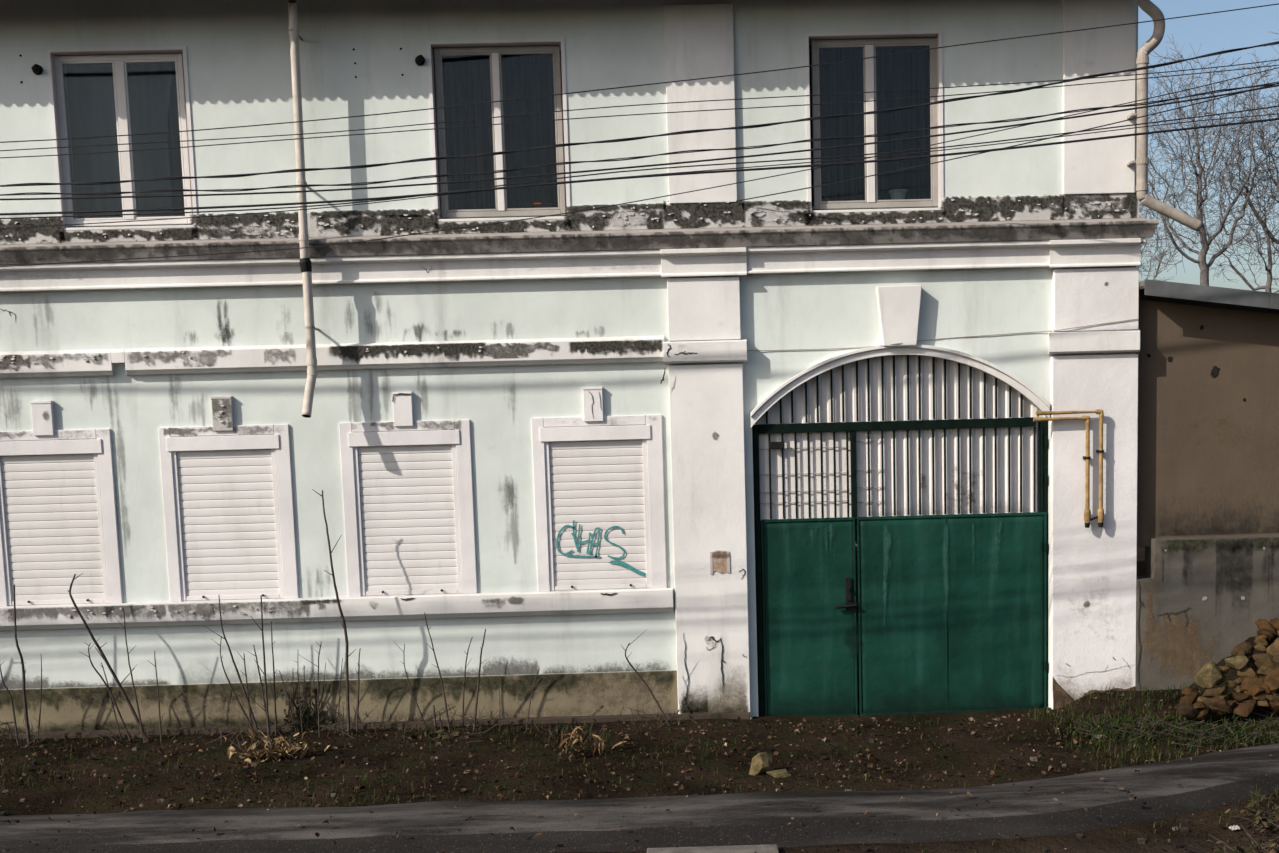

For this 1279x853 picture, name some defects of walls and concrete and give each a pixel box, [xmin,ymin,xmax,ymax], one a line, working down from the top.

peeling [0,218,173,244]
peeling [184,193,1139,240]
water stain [128,304,230,367]
spalling [710,551,730,574]
water stain [1160,519,1279,592]
water stain [0,659,748,733]
crack [683,633,747,702]